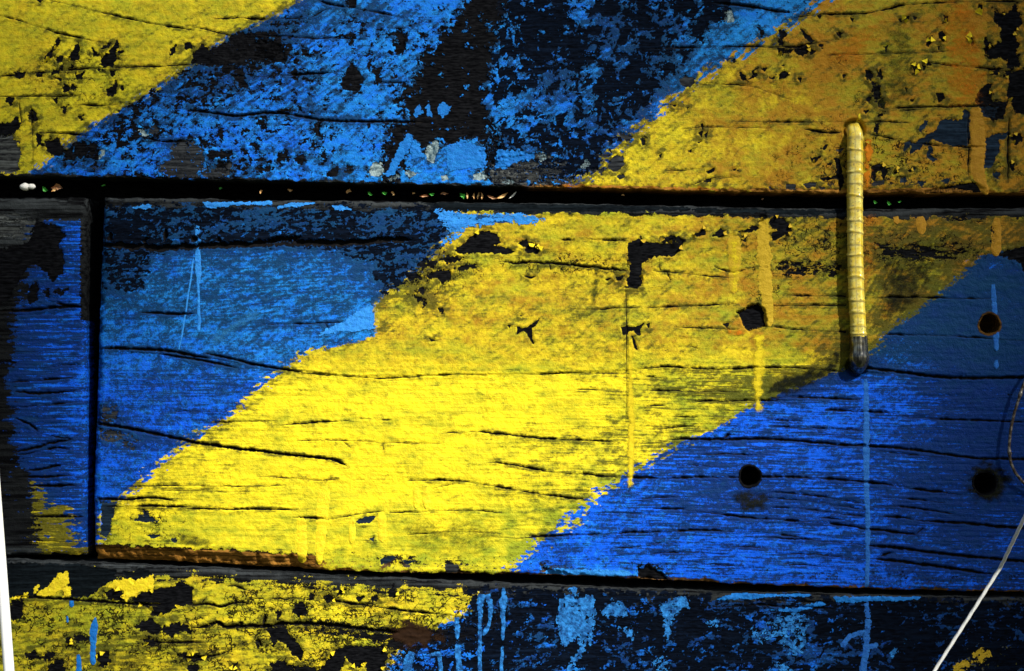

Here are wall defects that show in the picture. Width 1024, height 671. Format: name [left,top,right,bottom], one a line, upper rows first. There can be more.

peeling [0,0,734,187]
spalling [733,28,824,85]
peeling [903,4,1024,164]
spalling [786,144,844,191]
spalling [870,162,926,188]
peeling [984,131,1024,180]
peeling [101,200,845,314]
crack [4,351,75,487]
crack [33,295,1024,574]
peeling [25,634,89,671]
peeling [7,562,194,650]
peeling [255,567,1024,671]